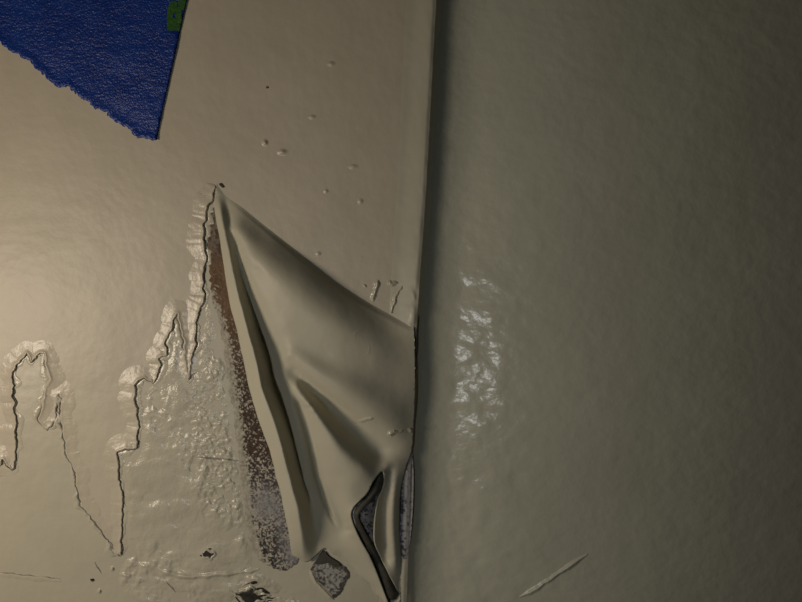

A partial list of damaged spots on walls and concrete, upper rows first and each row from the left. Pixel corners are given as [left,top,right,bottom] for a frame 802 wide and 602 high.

peeling [118,183,416,602]